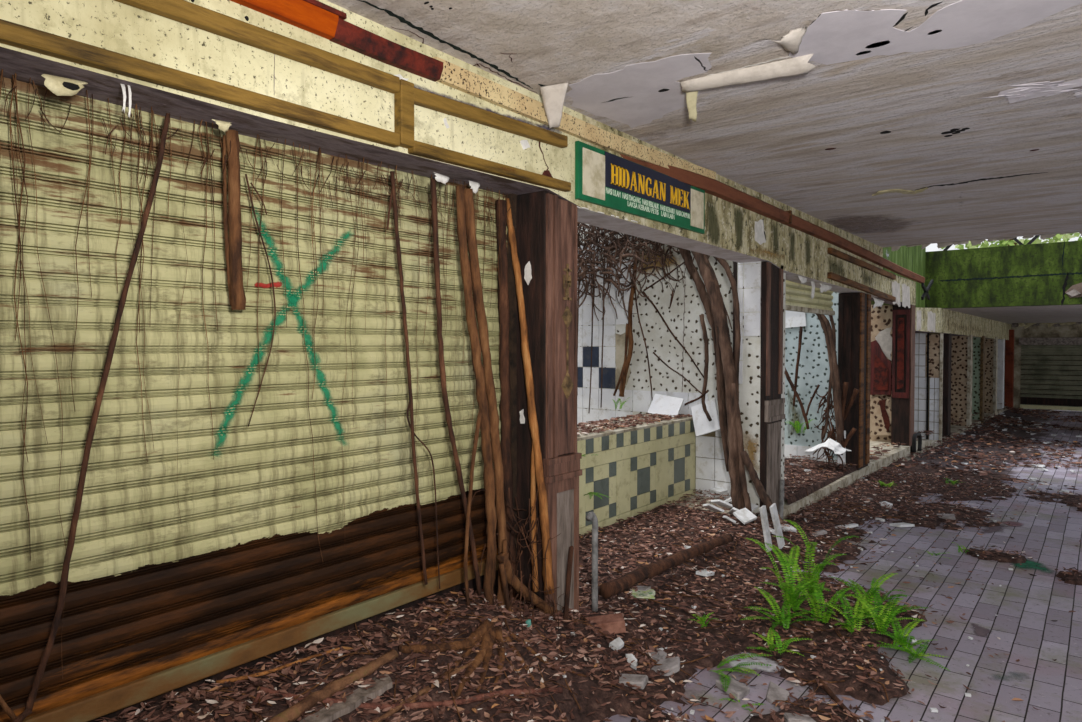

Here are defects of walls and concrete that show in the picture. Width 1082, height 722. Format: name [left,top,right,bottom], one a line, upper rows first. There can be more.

crack [358,0,545,93]
peeling [771,0,1082,65]
peeling [566,53,712,128]